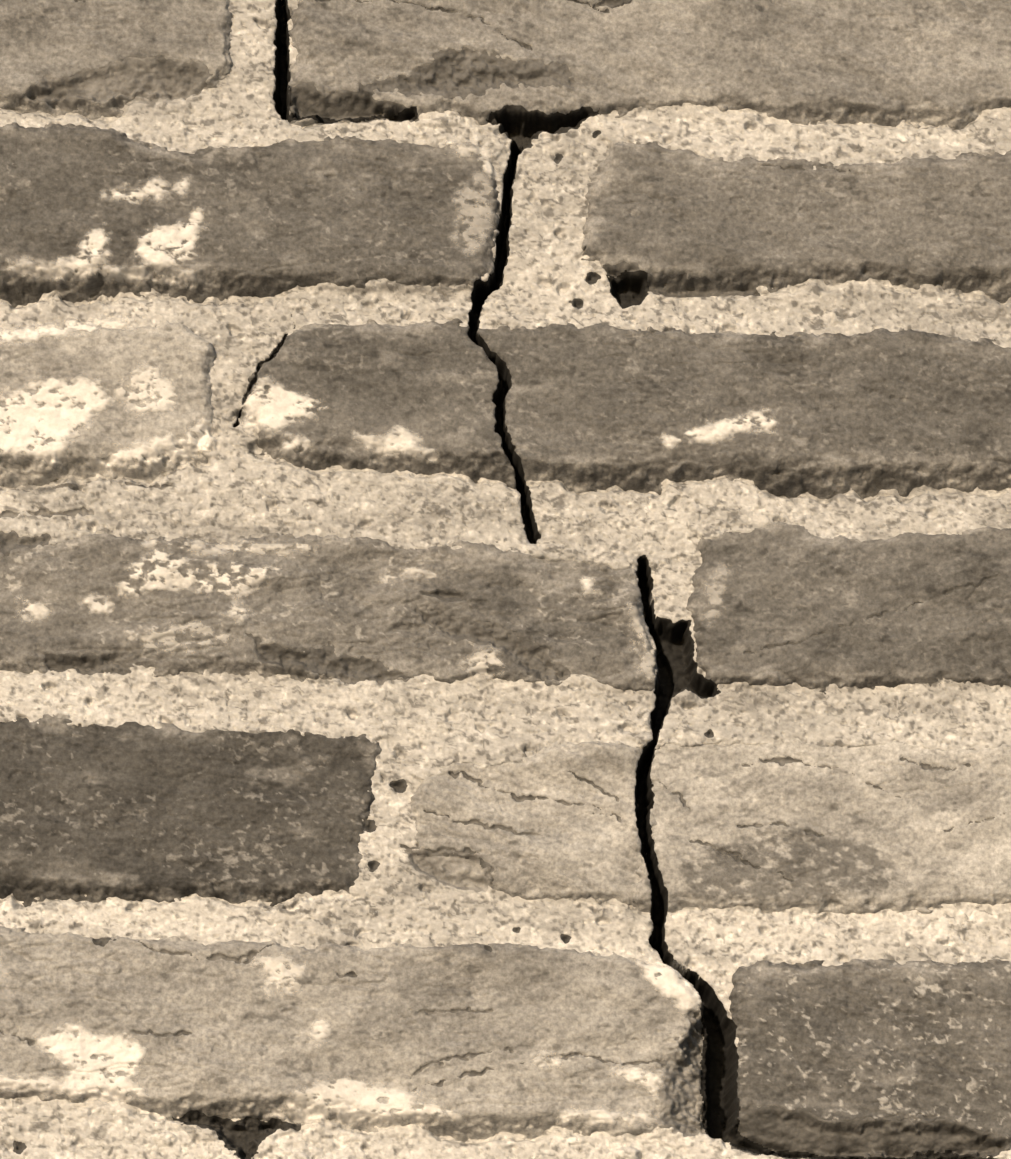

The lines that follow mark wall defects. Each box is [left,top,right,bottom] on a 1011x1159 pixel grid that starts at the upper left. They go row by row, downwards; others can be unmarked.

crack [273,0,533,124]
crack [568,0,632,13]
crack [762,164,851,172]
crack [233,314,295,427]
crack [467,105,600,544]
crack [393,555,1011,1159]
crack [336,970,358,978]